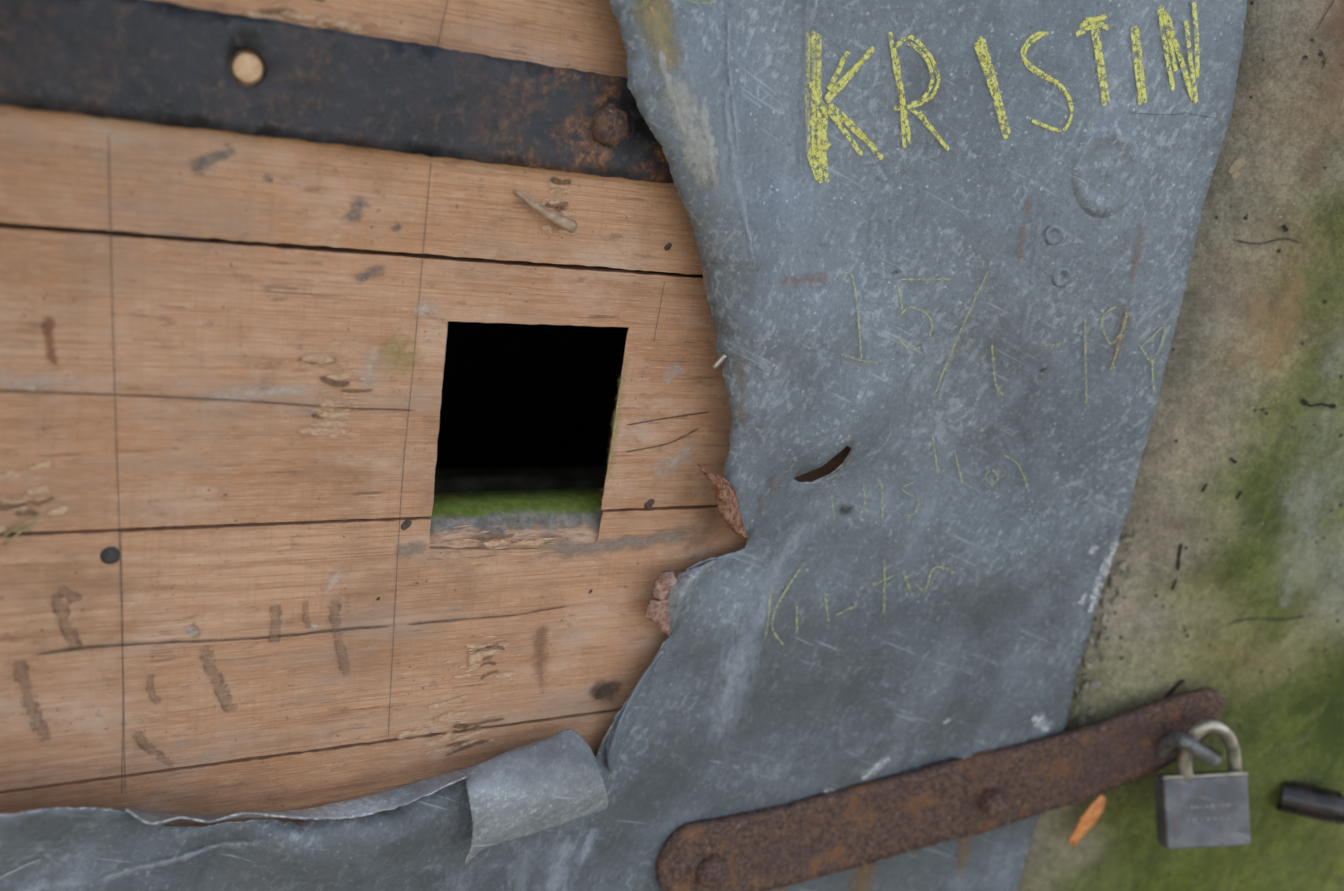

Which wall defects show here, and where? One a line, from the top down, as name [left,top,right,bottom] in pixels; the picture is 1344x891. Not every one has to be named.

peeling [245,0,361,31]
spalling [193,150,233,171]
spalling [43,317,57,364]
peeling [297,356,372,437]
efflorescence [1078,541,1118,612]
peeling [454,642,516,679]
peeling [396,718,504,756]
damp [1032,713,1050,732]